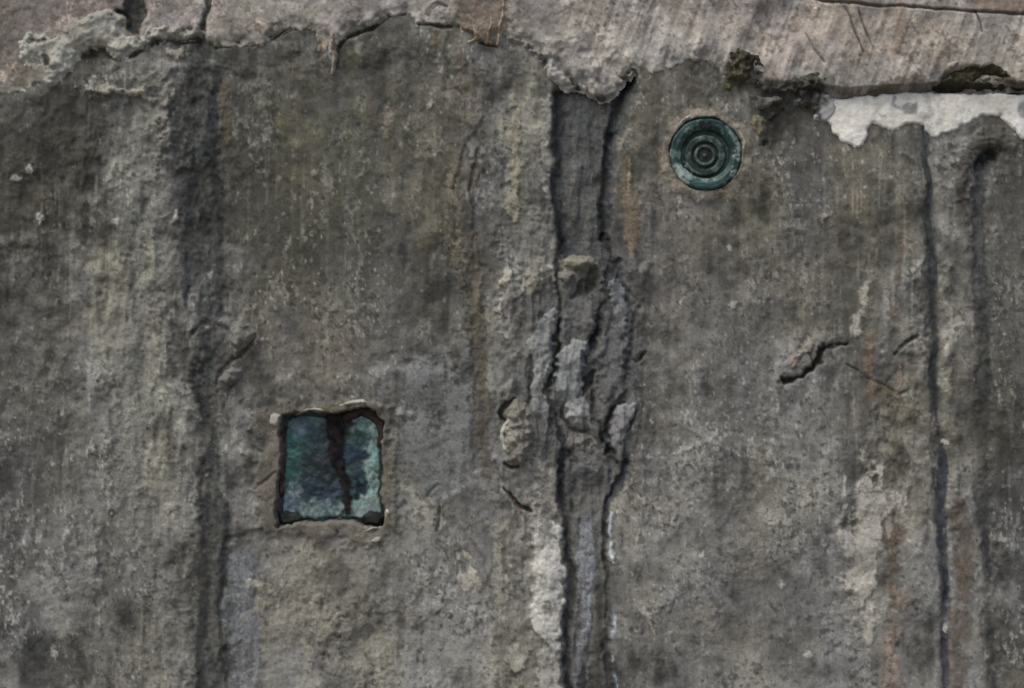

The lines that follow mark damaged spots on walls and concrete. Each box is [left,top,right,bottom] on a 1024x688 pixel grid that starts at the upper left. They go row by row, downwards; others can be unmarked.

flaking render [165,48,185,60]
flaking render [85,74,175,147]
water stain [546,87,586,503]
water stain [582,76,637,570]
water stain [921,125,939,414]
water stain [971,153,992,403]
crack [778,344,830,384]
crack [504,489,532,520]
water stain [925,439,950,688]
water stain [562,604,573,668]
water stain [597,589,617,647]